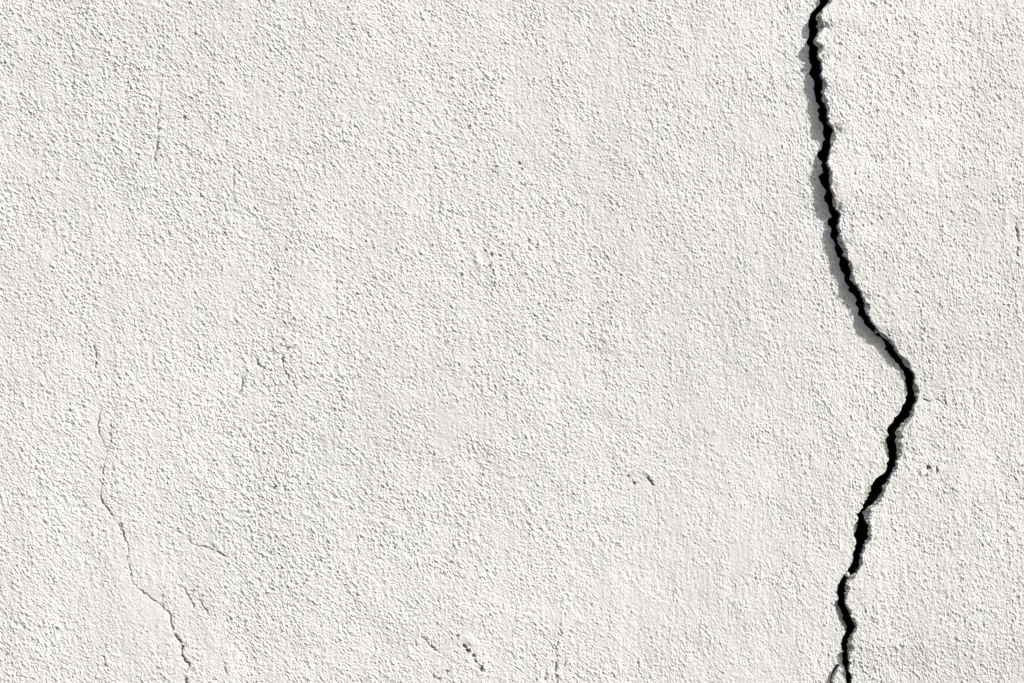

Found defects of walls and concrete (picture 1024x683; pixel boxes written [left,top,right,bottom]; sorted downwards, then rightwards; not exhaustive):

crack [806,0,946,683]